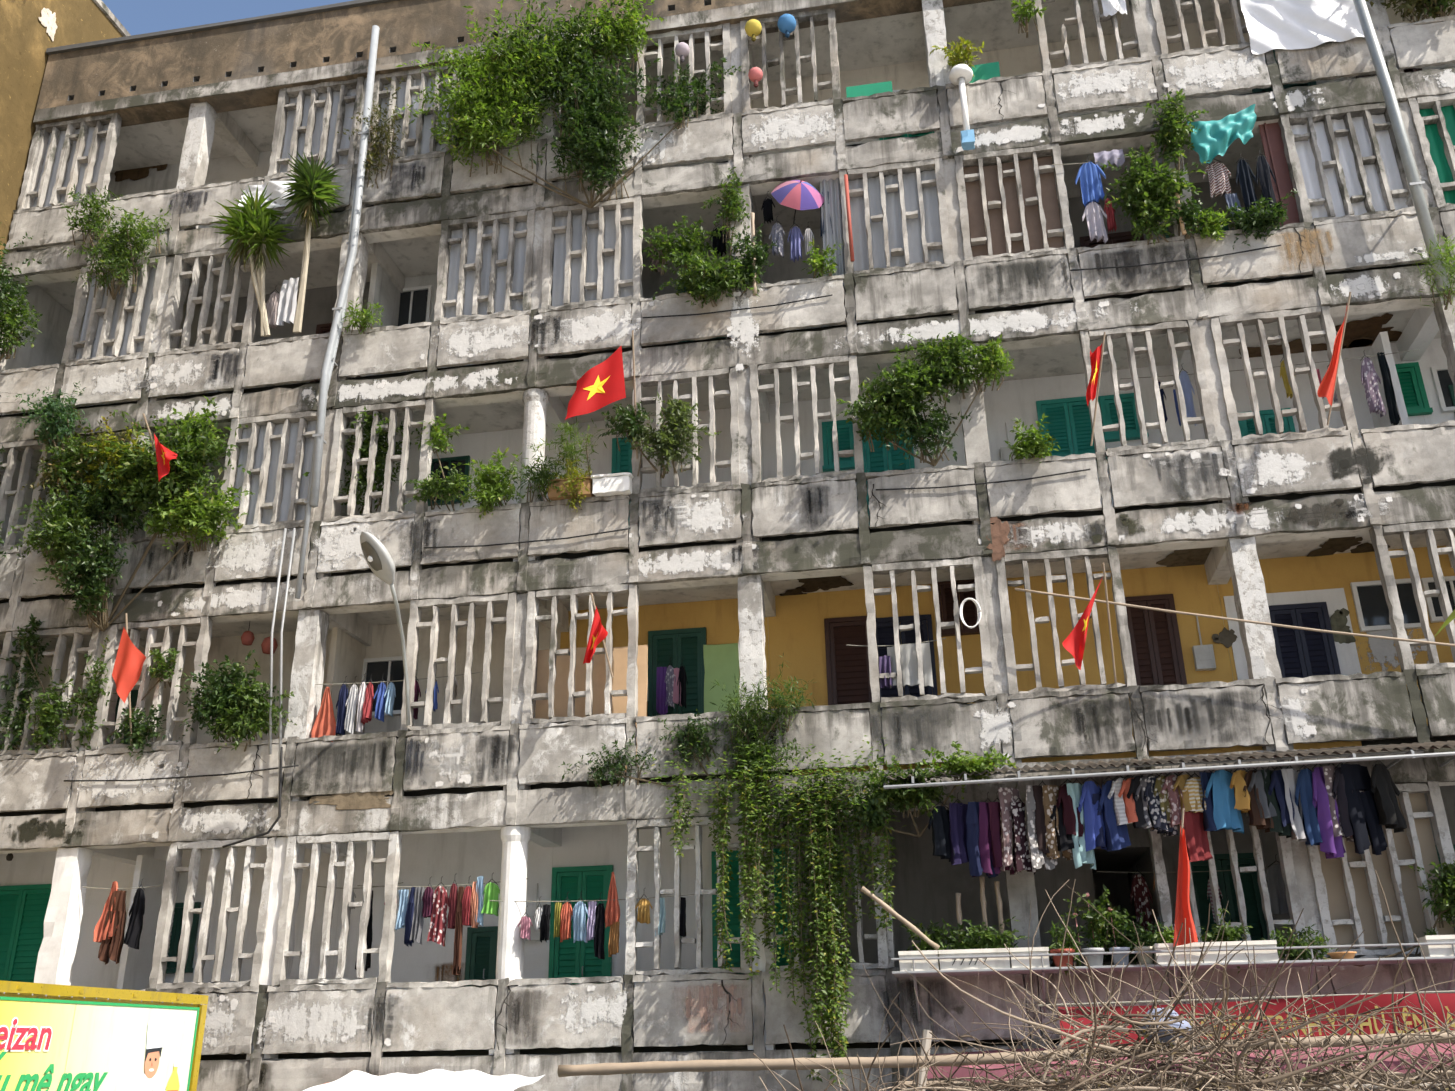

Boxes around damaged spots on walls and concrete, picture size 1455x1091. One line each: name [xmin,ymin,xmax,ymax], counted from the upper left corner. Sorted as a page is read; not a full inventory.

spalling [38,8,57,41]
peeling [1330,247,1427,299]
peeling [302,302,654,407]
peeling [727,290,760,371]
spalling [1238,313,1402,359]
mould [1328,443,1391,484]
peeling [1143,449,1318,567]
mould [1282,499,1363,526]
spalling [1306,494,1393,557]
leakage [1073,692,1247,745]
mould [9,817,86,844]
crack [717,980,738,1045]